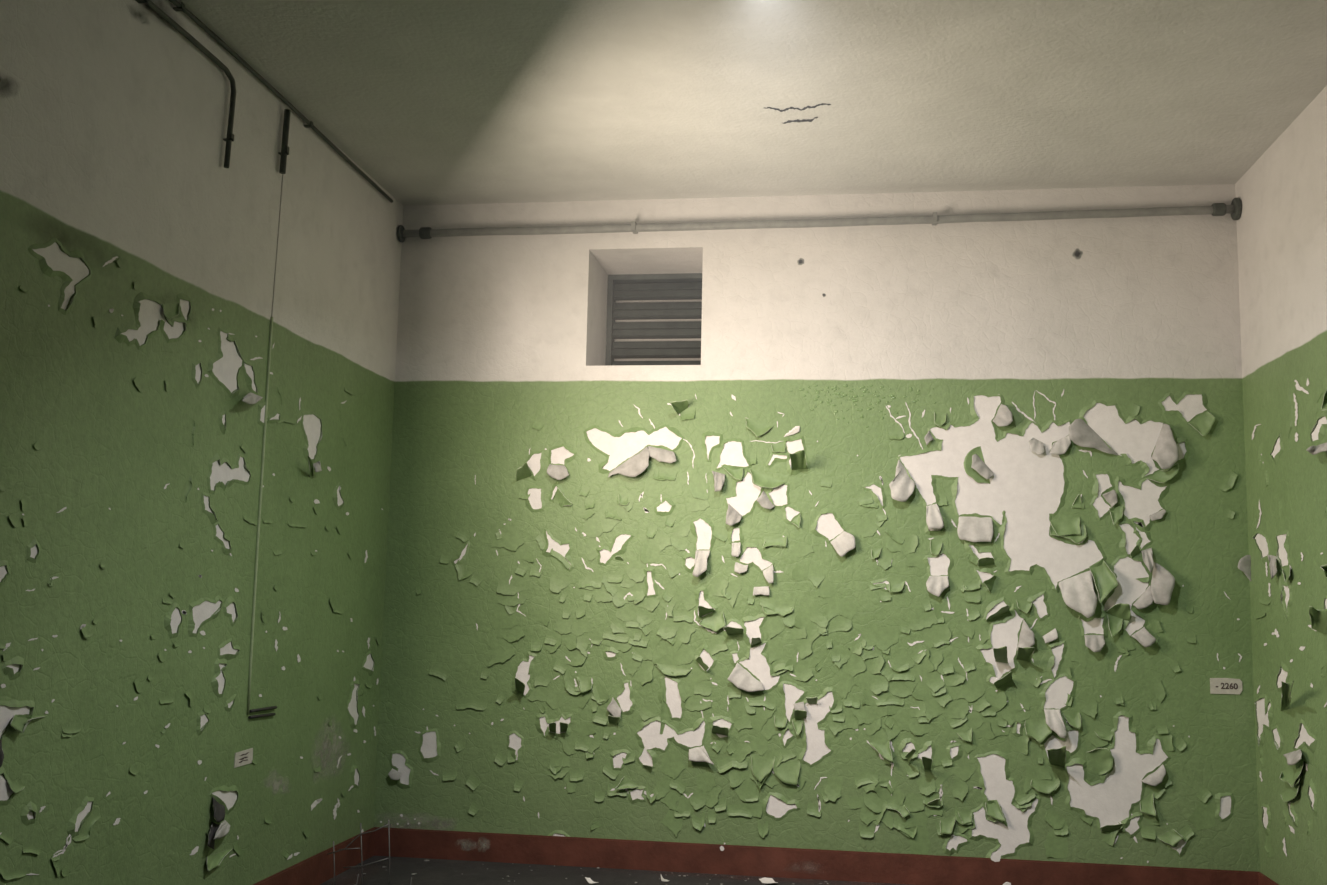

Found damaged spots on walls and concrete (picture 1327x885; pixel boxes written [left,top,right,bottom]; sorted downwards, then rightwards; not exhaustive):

peeling [28,238,92,316]
peeling [114,292,192,350]
peeling [191,327,281,434]
peeling [301,411,323,477]
peeling [1307,390,1327,455]
peeling [201,453,251,555]
peeling [1253,529,1293,621]
peeling [164,595,240,712]
peeling [488,391,1216,862]
peeling [0,699,45,826]
peeling [388,729,441,789]
peeling [1255,662,1318,827]